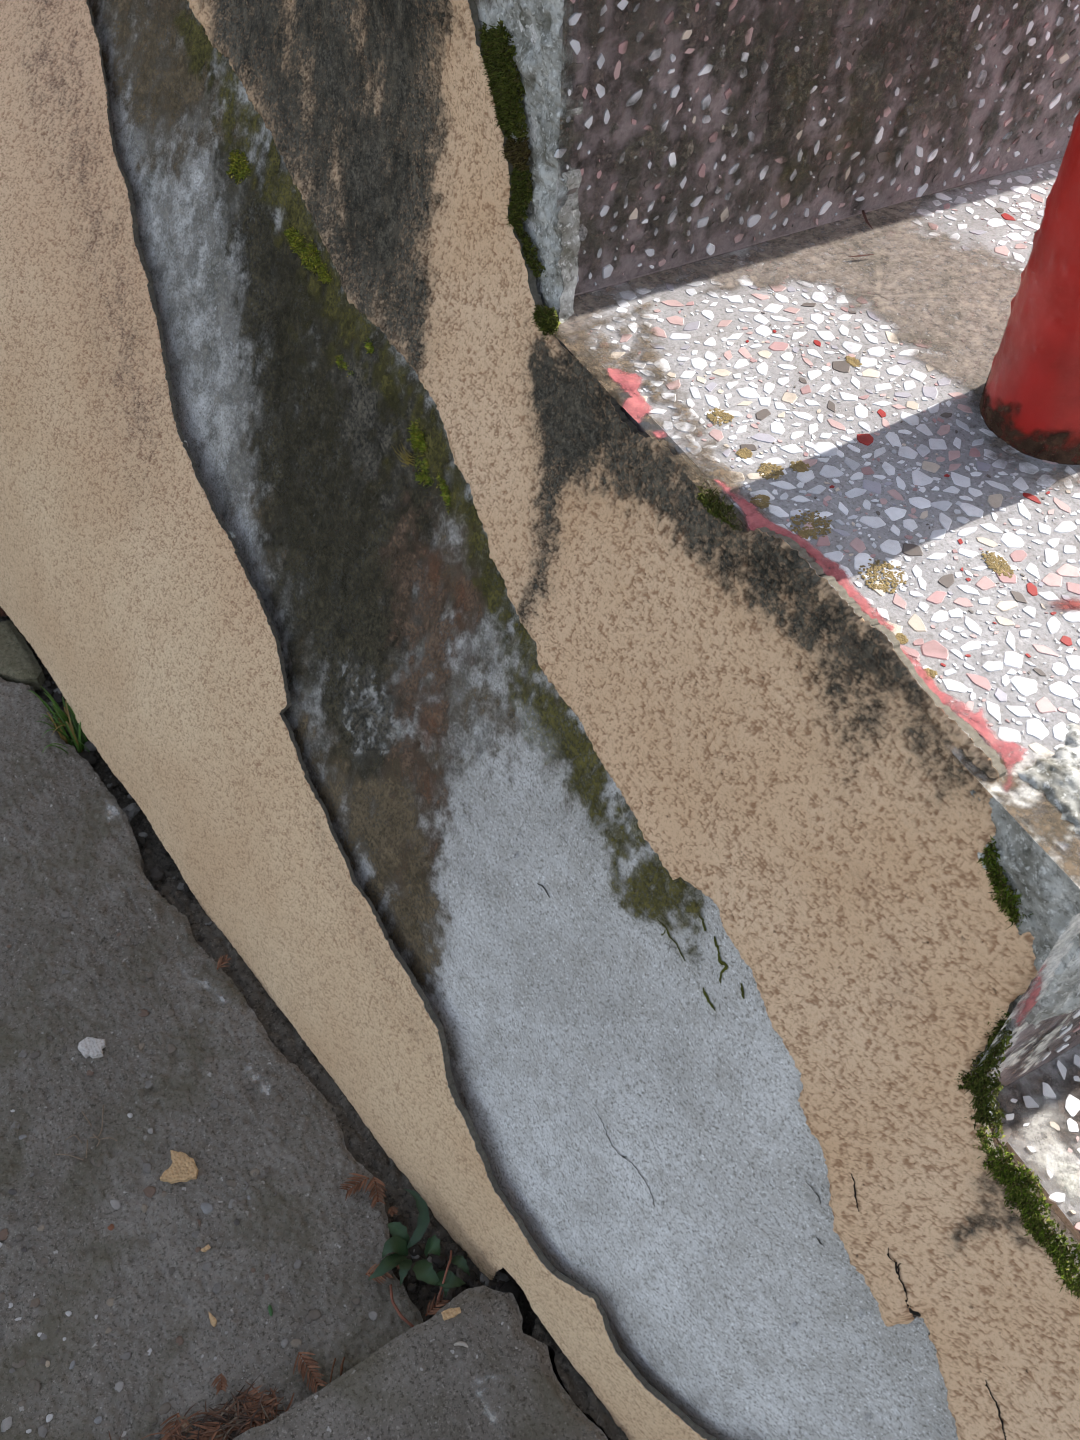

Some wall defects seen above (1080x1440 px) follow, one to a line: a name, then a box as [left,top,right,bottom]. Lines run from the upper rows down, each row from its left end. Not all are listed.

leakage [88,0,531,992]
peeling [385,336,473,505]
peeling [407,495,503,608]
leakage [518,337,922,742]
peeling [554,0,1080,767]
crack [887,1248,909,1307]
crack [985,1380,1007,1440]